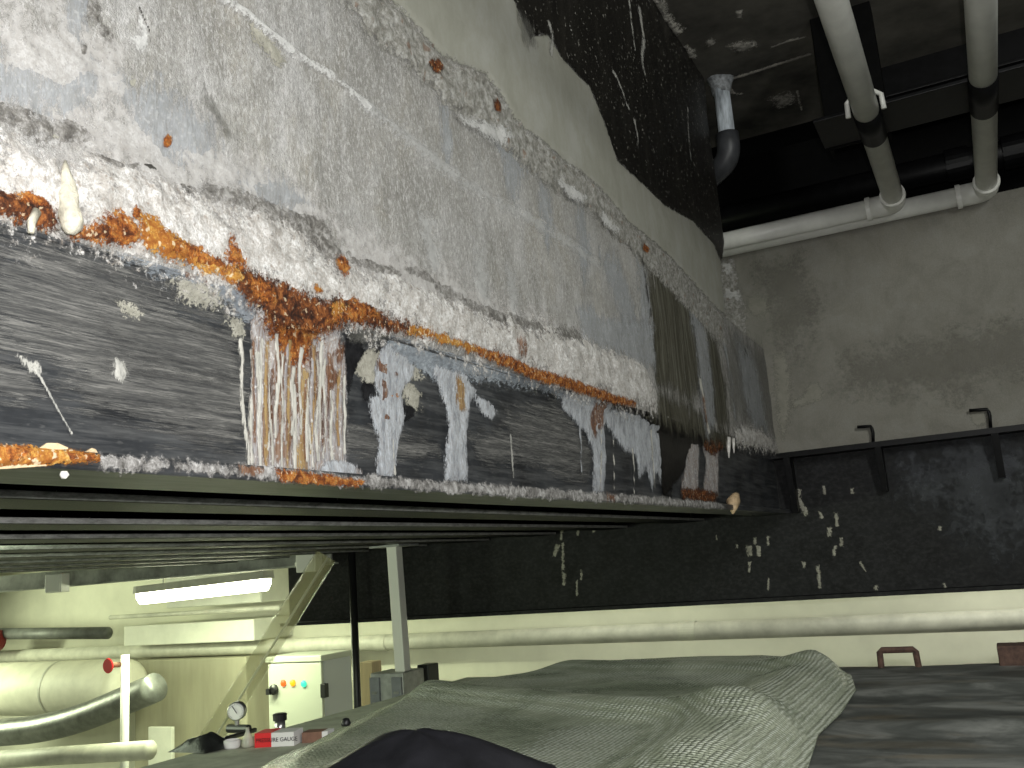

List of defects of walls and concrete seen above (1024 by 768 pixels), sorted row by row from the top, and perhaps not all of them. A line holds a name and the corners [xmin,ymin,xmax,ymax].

spalling [0,101,156,175]
peeling [0,227,252,462]
corrosion [0,190,636,474]
peeling [344,332,380,402]
peeling [344,420,380,460]
spalling [180,183,583,343]
leakage [0,0,779,514]
peeling [396,365,441,463]